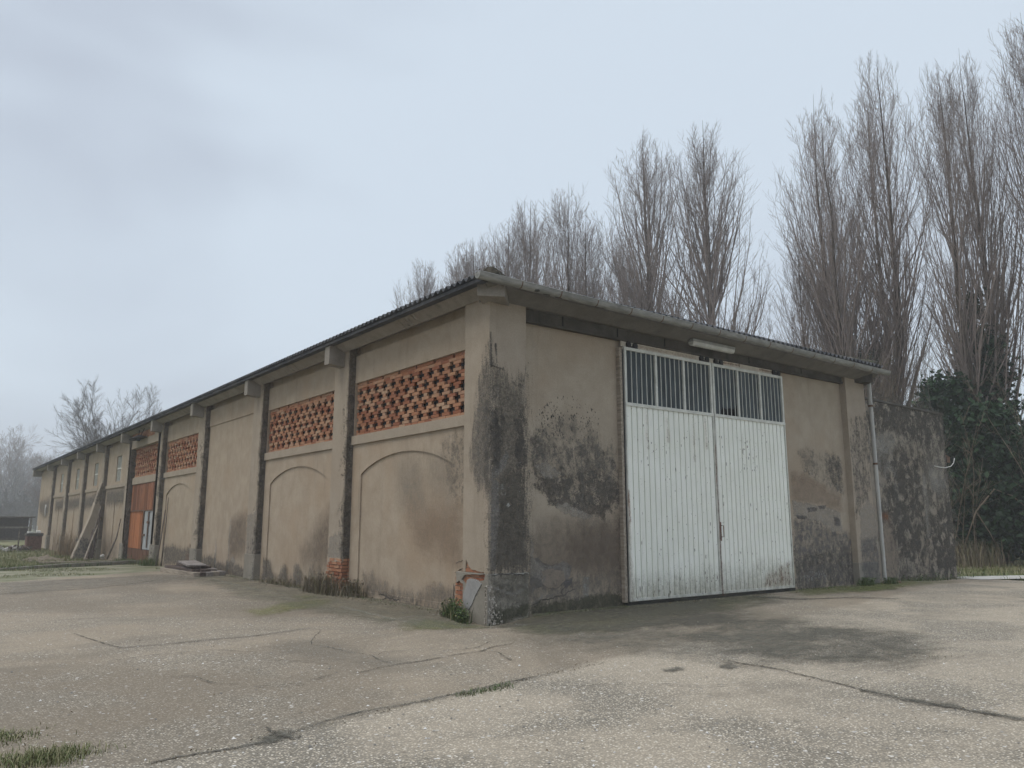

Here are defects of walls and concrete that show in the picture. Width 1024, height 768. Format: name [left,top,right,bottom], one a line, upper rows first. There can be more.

flaking render [325,534,349,591]
peeling [455,440,523,626]
damp [451,333,931,663]
damp [792,391,960,590]